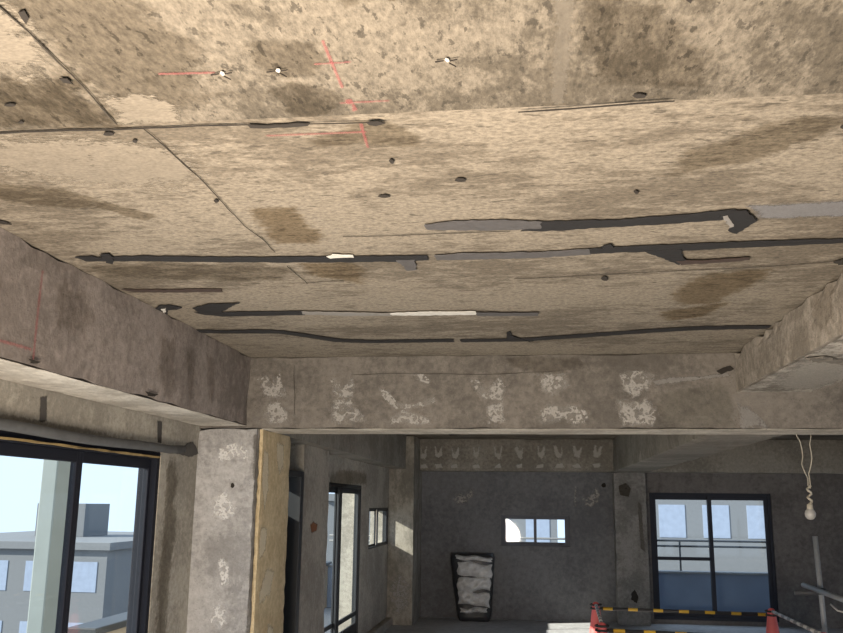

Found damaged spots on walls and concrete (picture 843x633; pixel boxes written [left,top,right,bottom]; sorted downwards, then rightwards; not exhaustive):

crack [0,6,843,284]
efflorescence [261,374,288,423]
water stain [330,378,363,424]
efflorescence [381,390,434,425]
efflorescence [470,378,506,424]
efflorescence [540,372,566,395]
efflorescence [540,406,588,424]
efflorescence [619,370,655,427]
water stain [219,443,247,460]
water stain [213,492,234,520]
water stain [218,559,230,585]